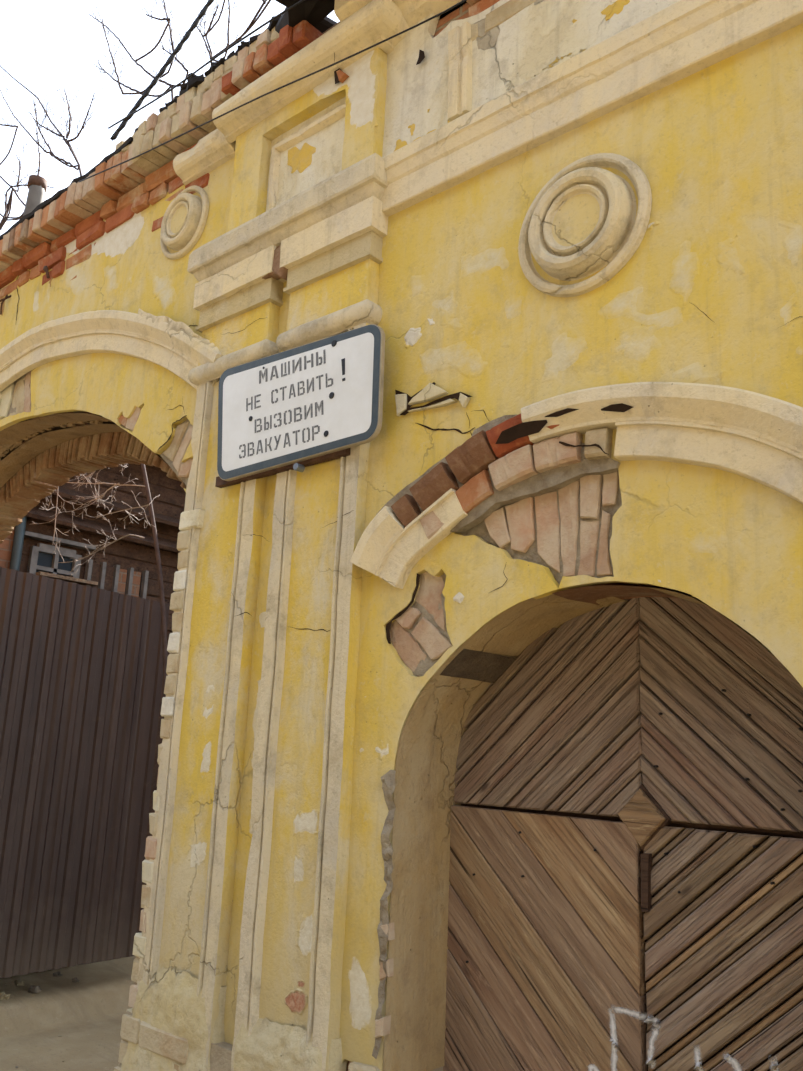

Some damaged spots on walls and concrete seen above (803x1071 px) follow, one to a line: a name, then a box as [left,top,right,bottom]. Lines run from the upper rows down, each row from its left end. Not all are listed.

flaking render [473,18,500,50]
peeling [601,0,637,38]
peeling [461,247,510,279]
peeling [395,274,489,417]
spalling [460,471,622,585]
spalling [386,572,465,676]
spalling [346,743,396,1059]
spalling [285,980,308,1015]